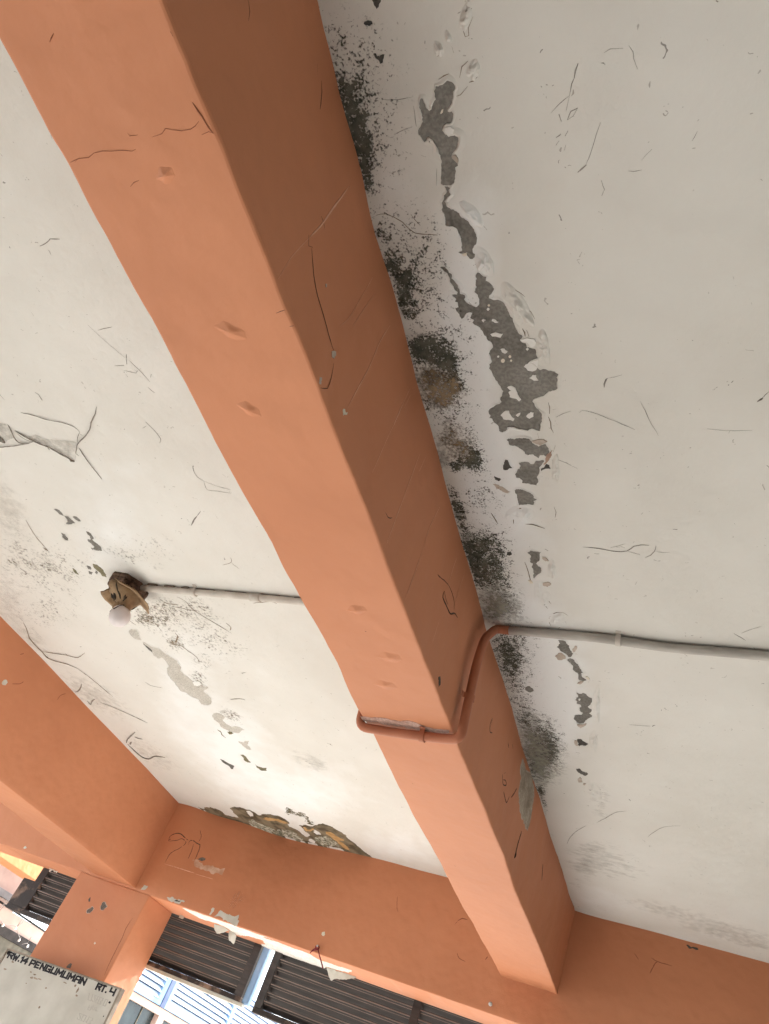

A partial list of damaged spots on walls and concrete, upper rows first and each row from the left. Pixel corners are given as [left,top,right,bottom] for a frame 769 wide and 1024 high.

crack [72,121,212,162]
water stain [325,24,398,195]
peeling [415,73,562,505]
water stain [370,204,564,807]
peeling [555,639,593,747]
peeling [518,758,534,831]
peeling [167,897,352,973]